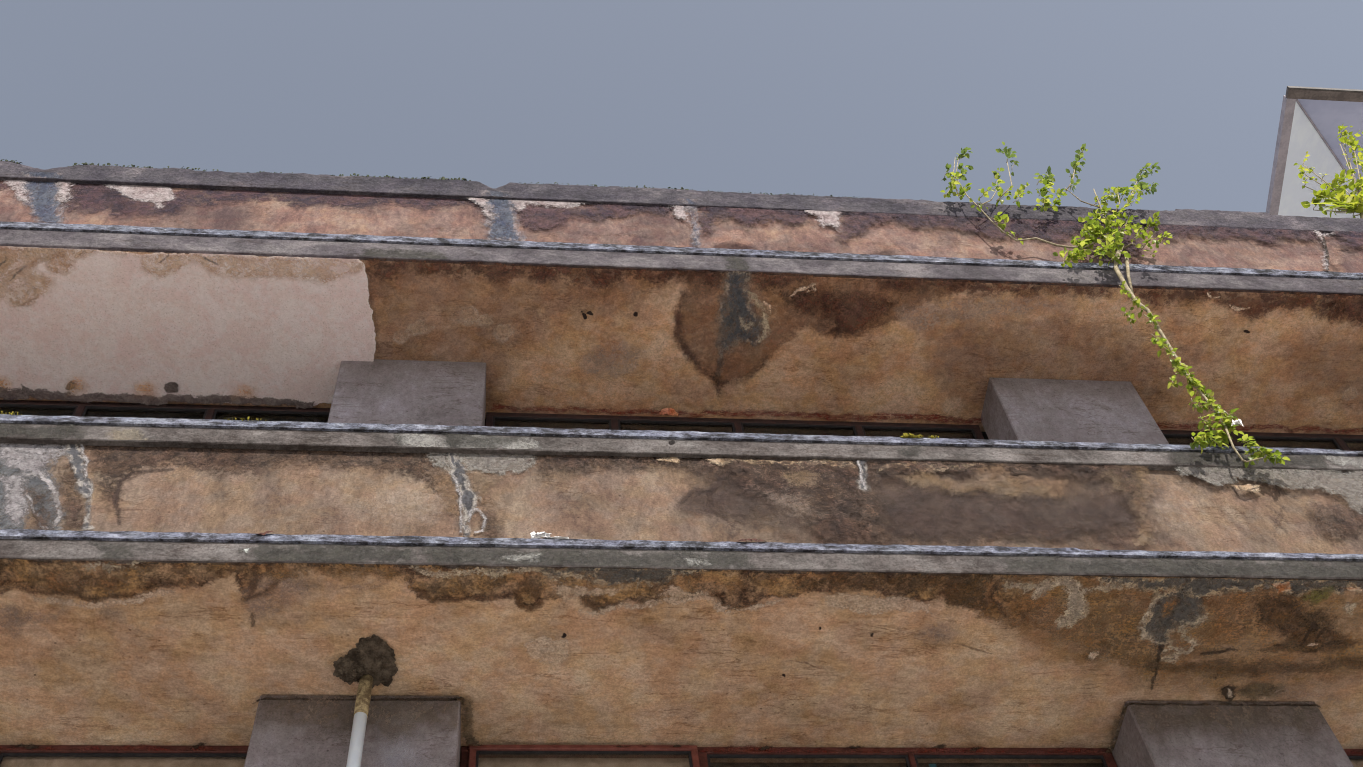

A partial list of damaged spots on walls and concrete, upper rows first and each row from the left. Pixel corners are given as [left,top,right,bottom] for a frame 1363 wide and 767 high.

leakage [0,248,96,305]
peeling [0,246,376,406]
leakage [116,248,1112,387]
leakage [0,381,315,409]
spalling [110,429,146,449]
peeling [1157,422,1363,434]
peeling [1177,456,1363,514]
leakage [0,423,1363,736]